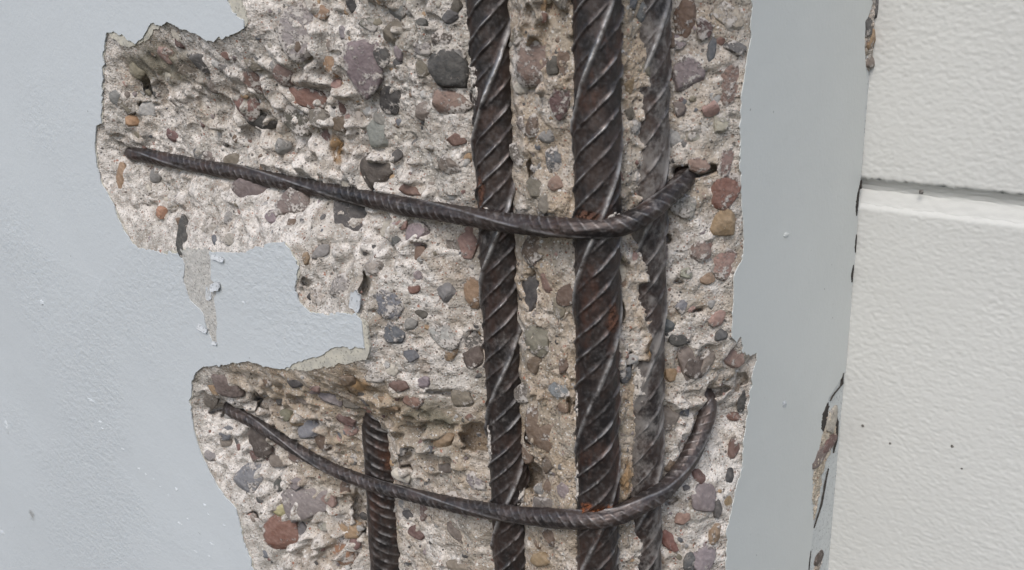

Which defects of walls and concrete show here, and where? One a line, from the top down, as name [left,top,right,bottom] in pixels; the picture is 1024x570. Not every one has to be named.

rust [330,136,343,163]
spalling [508,0,575,218]
spalling [620,0,651,214]
spalling [96,0,495,570]
spalling [514,234,577,509]
spalling [524,525,577,570]
spalling [618,520,643,570]
spalling [618,234,652,504]
spalling [660,0,757,570]
spalling [814,548,824,570]
spalling [812,405,838,519]